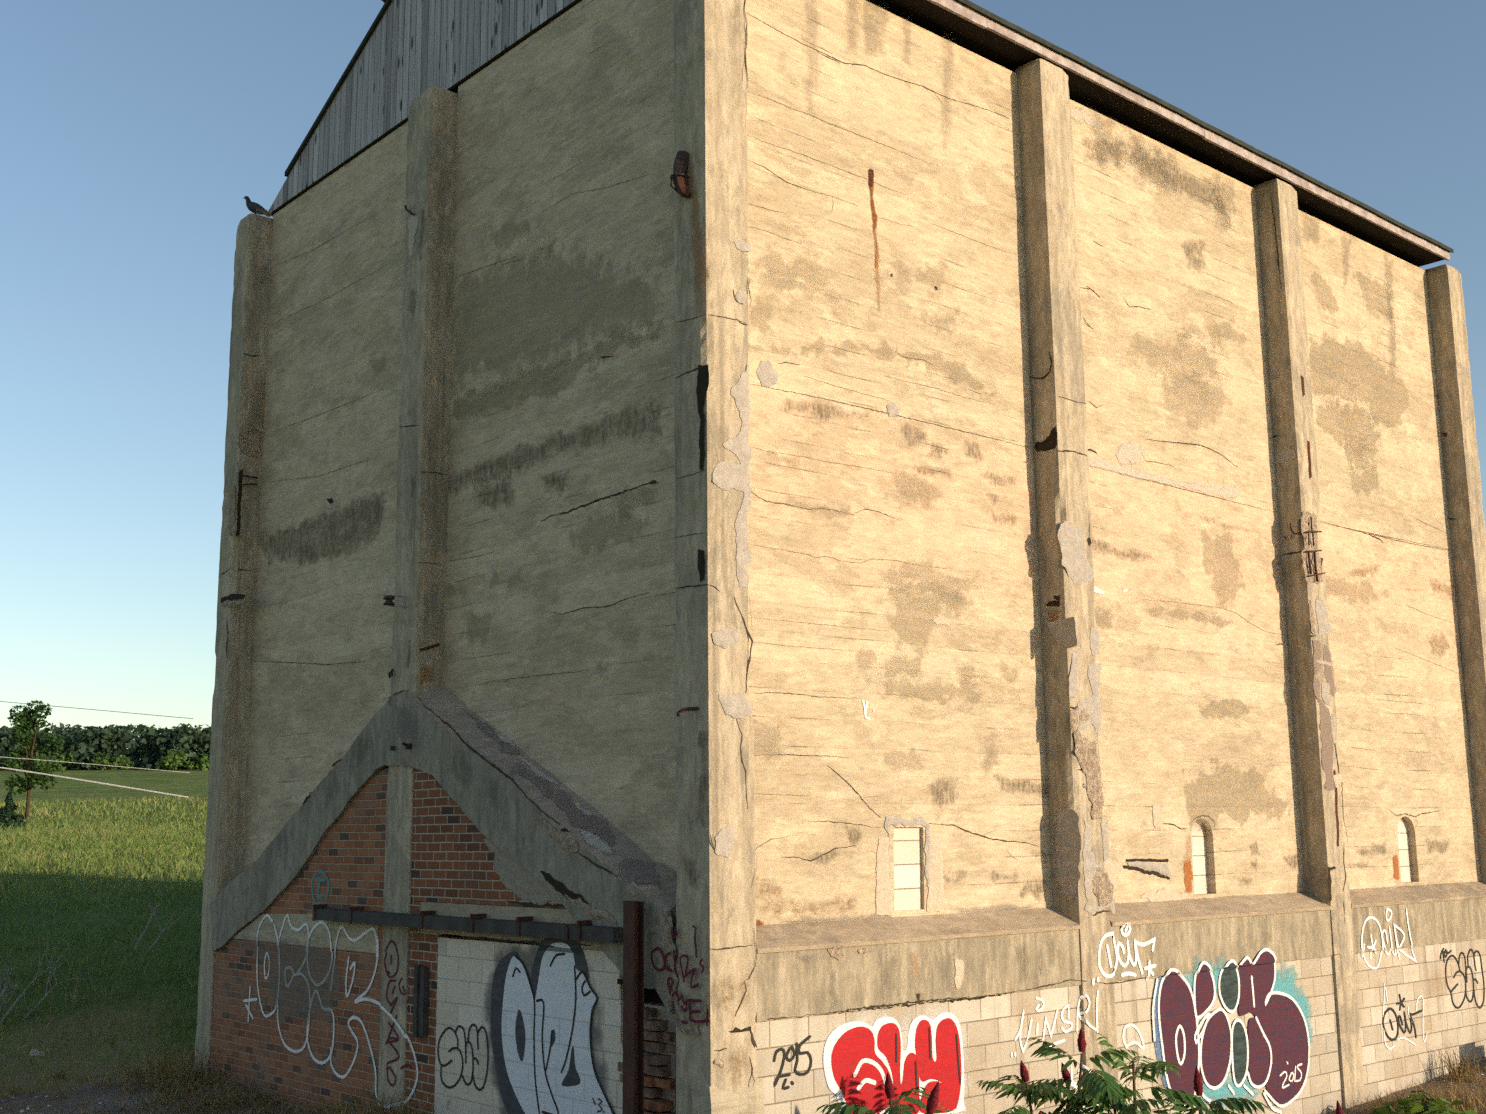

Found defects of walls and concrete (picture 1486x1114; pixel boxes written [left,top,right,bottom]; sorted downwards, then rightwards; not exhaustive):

corrosion [869,169,878,268]
peeling [1283,512,1343,790]
peeling [574,802,612,854]
crack [929,823,1039,859]
spalling [1069,651,1171,916]